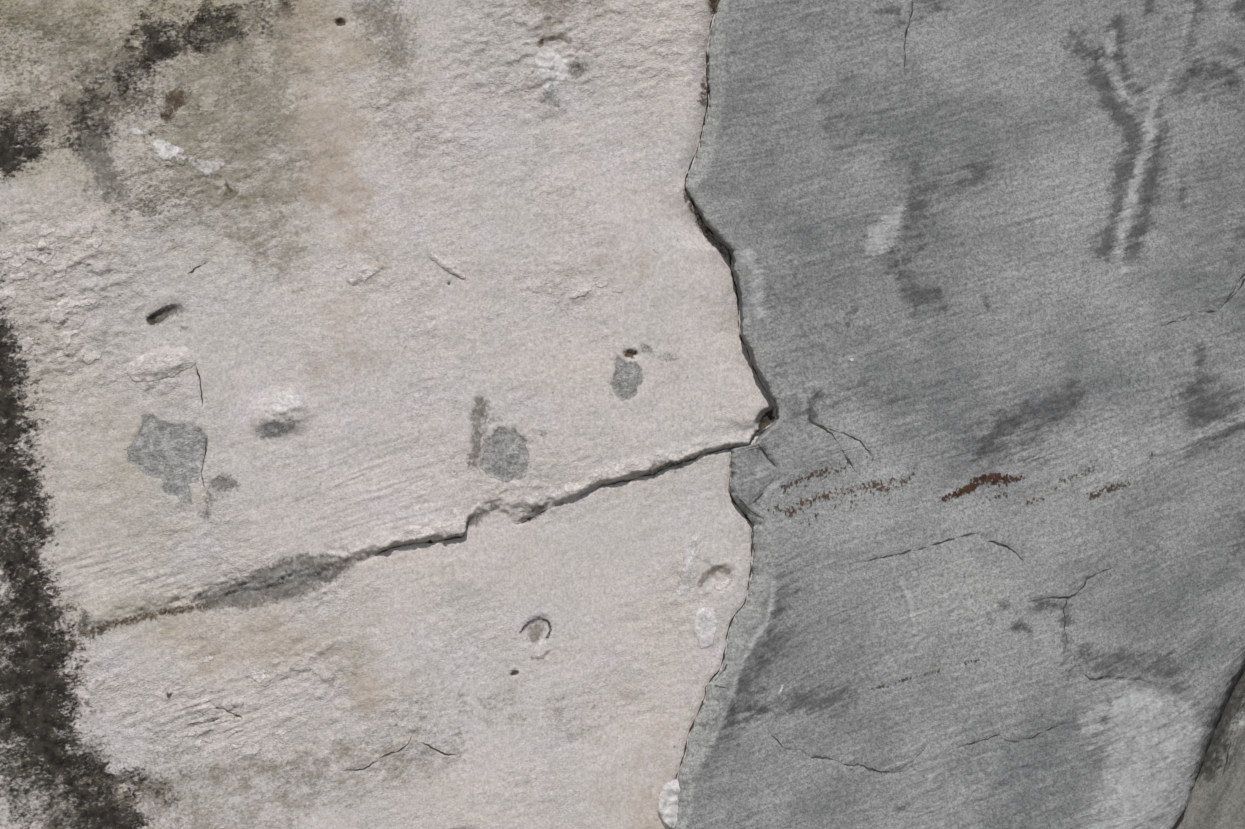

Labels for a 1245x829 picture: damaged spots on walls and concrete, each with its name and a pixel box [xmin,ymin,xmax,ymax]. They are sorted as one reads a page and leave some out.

water stain [0,0,311,278]
flaking render [610,346,674,401]
flaking render [127,414,237,518]
flaking render [467,397,529,482]
corrosion [755,458,915,525]
corrosion [942,464,1098,504]
corrosion [1086,452,1154,500]
water stain [0,301,463,829]
crack [363,526,468,560]
spalling [698,566,732,590]
peeling [693,608,718,648]